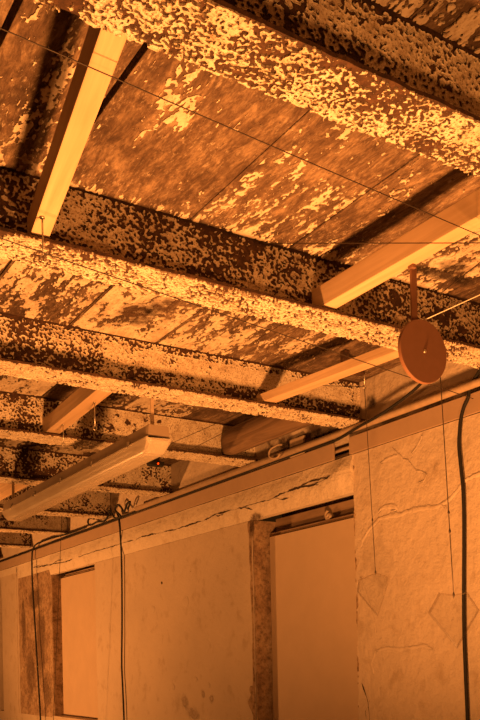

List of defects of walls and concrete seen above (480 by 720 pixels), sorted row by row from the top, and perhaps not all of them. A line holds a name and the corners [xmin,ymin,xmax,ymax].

damp [122,300,172,324]
peeling [0,0,480,549]
crack [16,476,329,576]
crack [361,471,480,547]
damp [22,590,40,643]
damp [27,618,45,687]